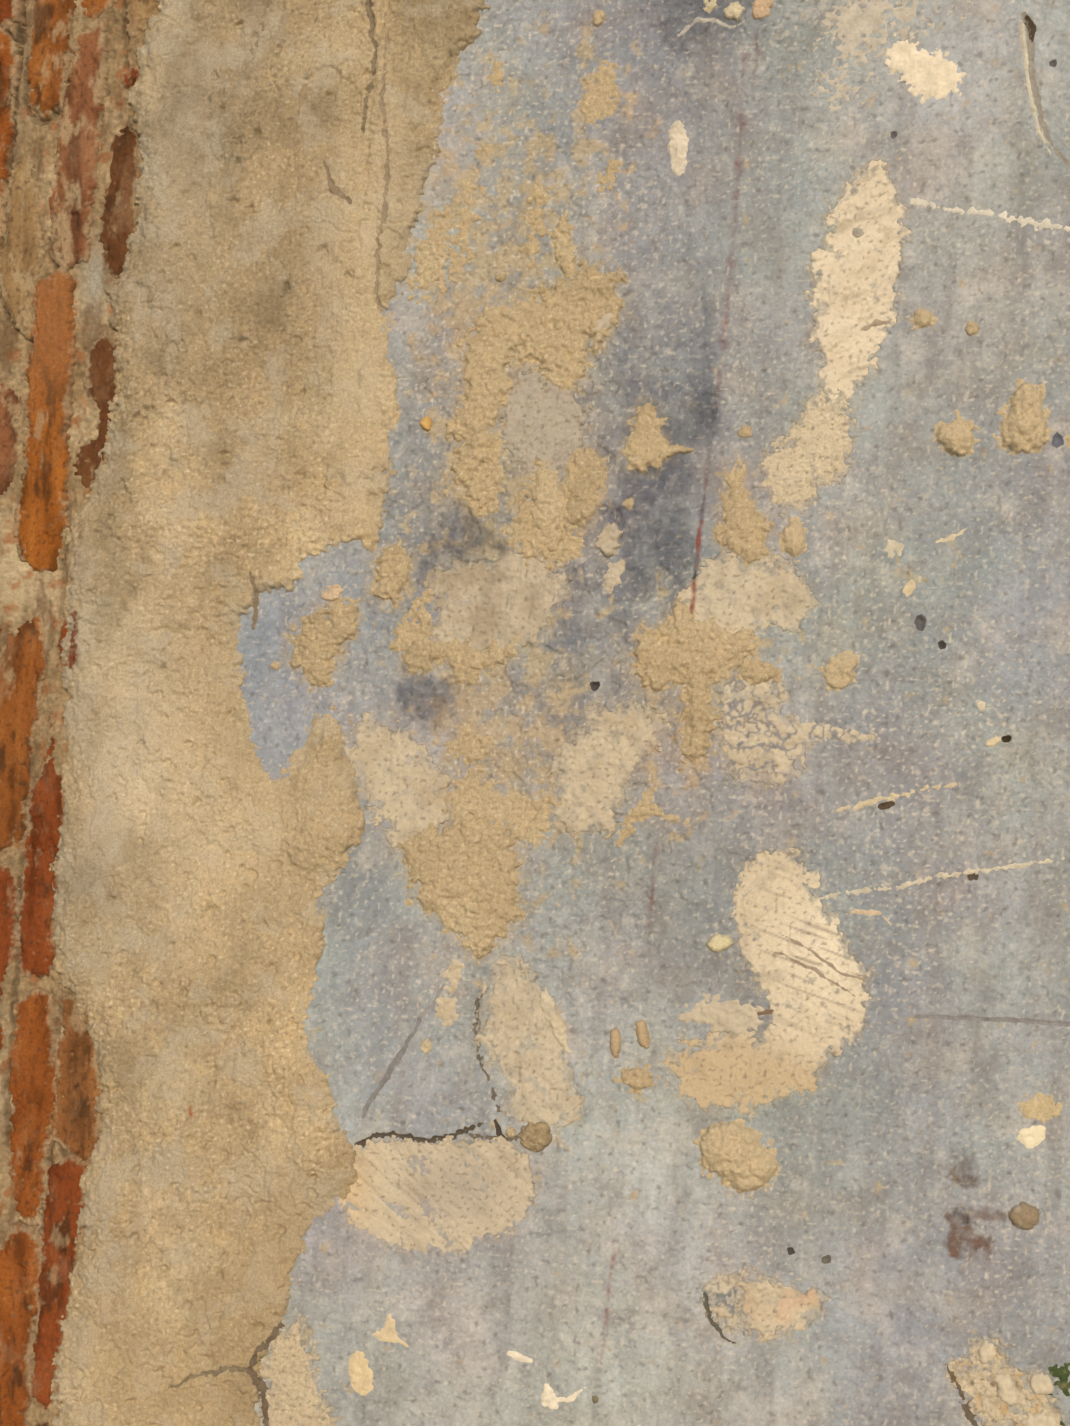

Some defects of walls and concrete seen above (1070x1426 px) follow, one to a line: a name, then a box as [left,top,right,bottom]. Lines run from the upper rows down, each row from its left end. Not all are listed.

peeling [490,359,593,474]
peeling [426,548,574,651]
peeling [914,614,927,631]
flaking render [0,0,535,1426]
crack [354,983,518,1148]
peeling [473,950,585,1132]